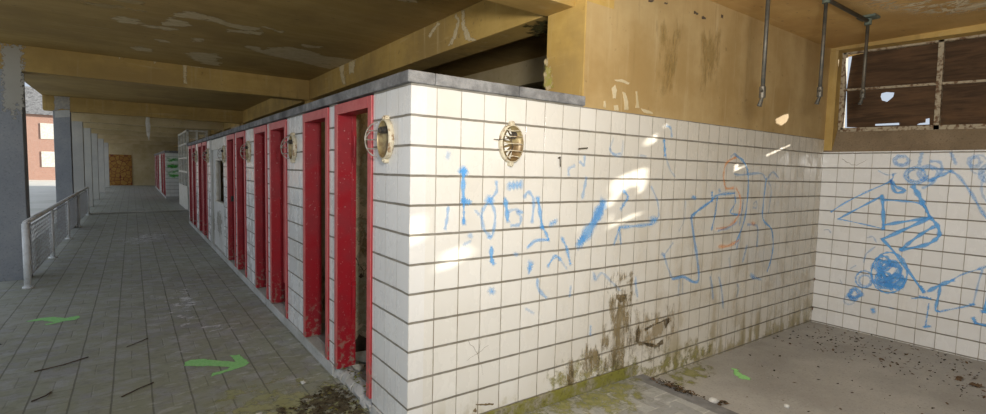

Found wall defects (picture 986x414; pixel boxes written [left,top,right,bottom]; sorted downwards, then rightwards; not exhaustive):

peeling [109,11,353,69]
peeling [873,0,986,14]
peeling [0,43,26,119]
leakage [568,278,674,386]